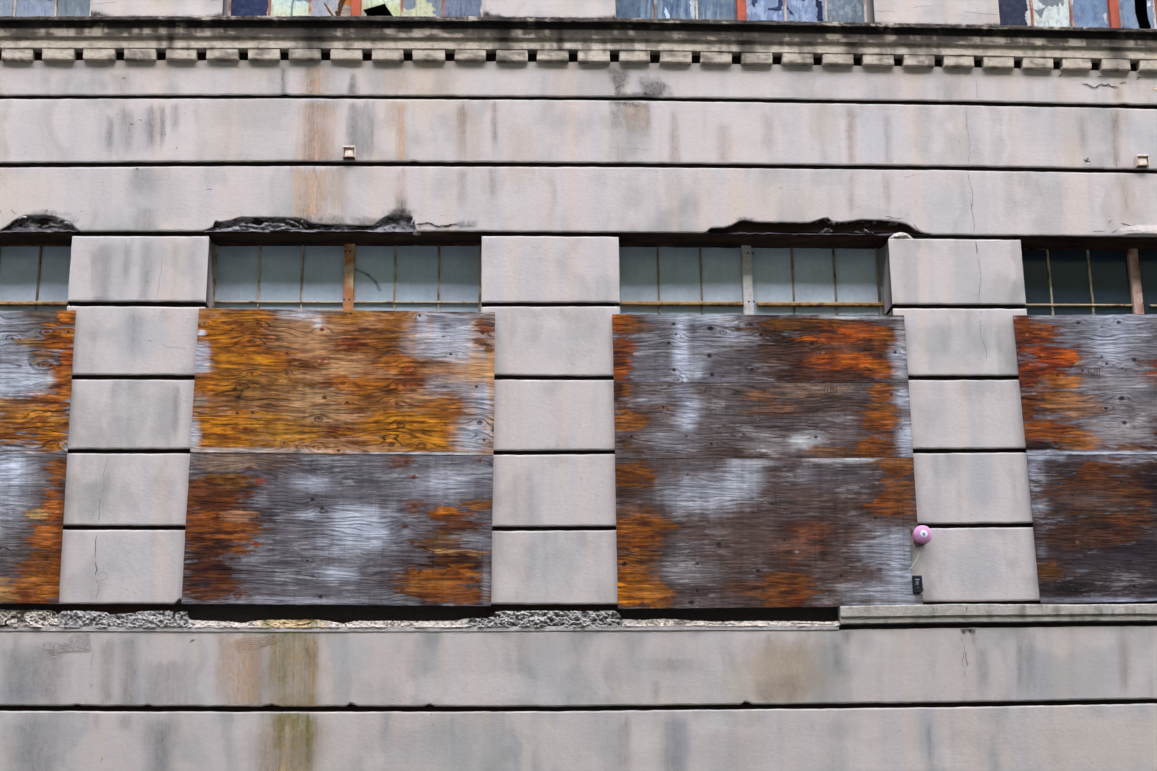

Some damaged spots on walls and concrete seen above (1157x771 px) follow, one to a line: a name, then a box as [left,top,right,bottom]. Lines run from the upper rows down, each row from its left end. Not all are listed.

spalling [886,216,925,239]